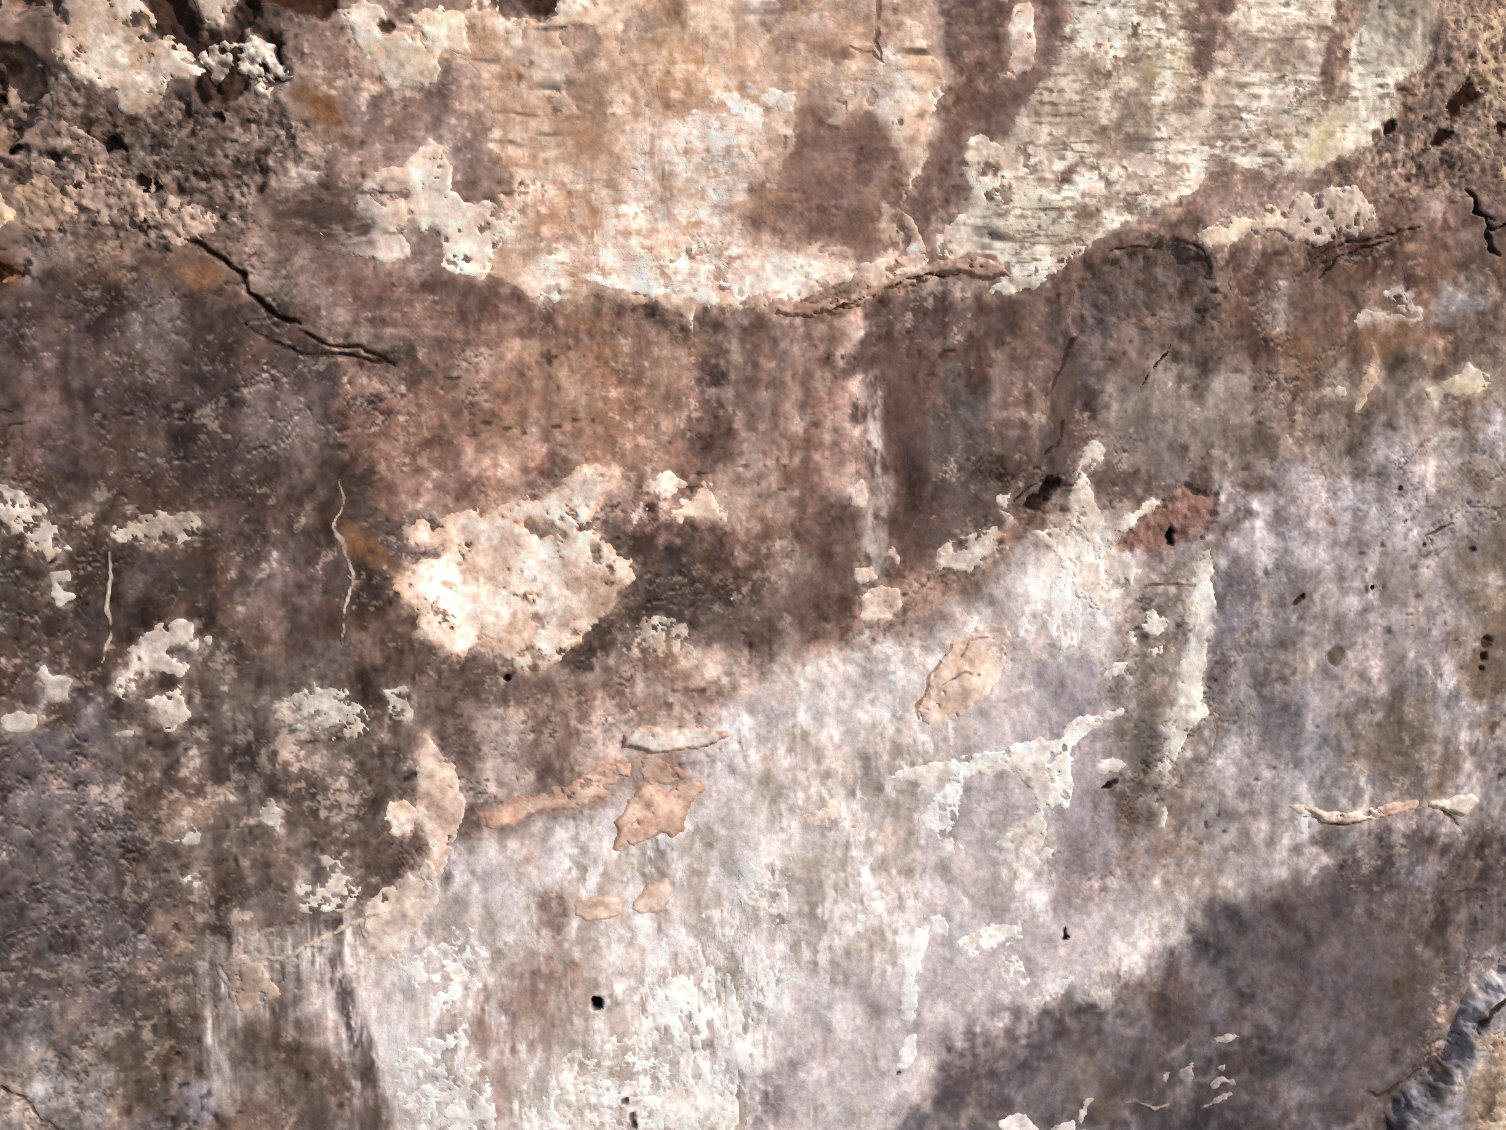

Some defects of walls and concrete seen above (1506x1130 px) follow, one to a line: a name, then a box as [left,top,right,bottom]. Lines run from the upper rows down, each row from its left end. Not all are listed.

water stain [711,0,1443,278]
corrosion [0,249,38,302]
corrosion [56,220,245,304]
crack [183,238,396,367]
crack [1312,226,1420,279]
crack [1464,189,1506,257]
peeling [392,464,636,672]
peeling [915,440,1220,774]
peeling [114,619,212,733]
water stain [181,303,1443,1130]
peeling [294,734,497,1130]
crack [0,1064,64,1130]